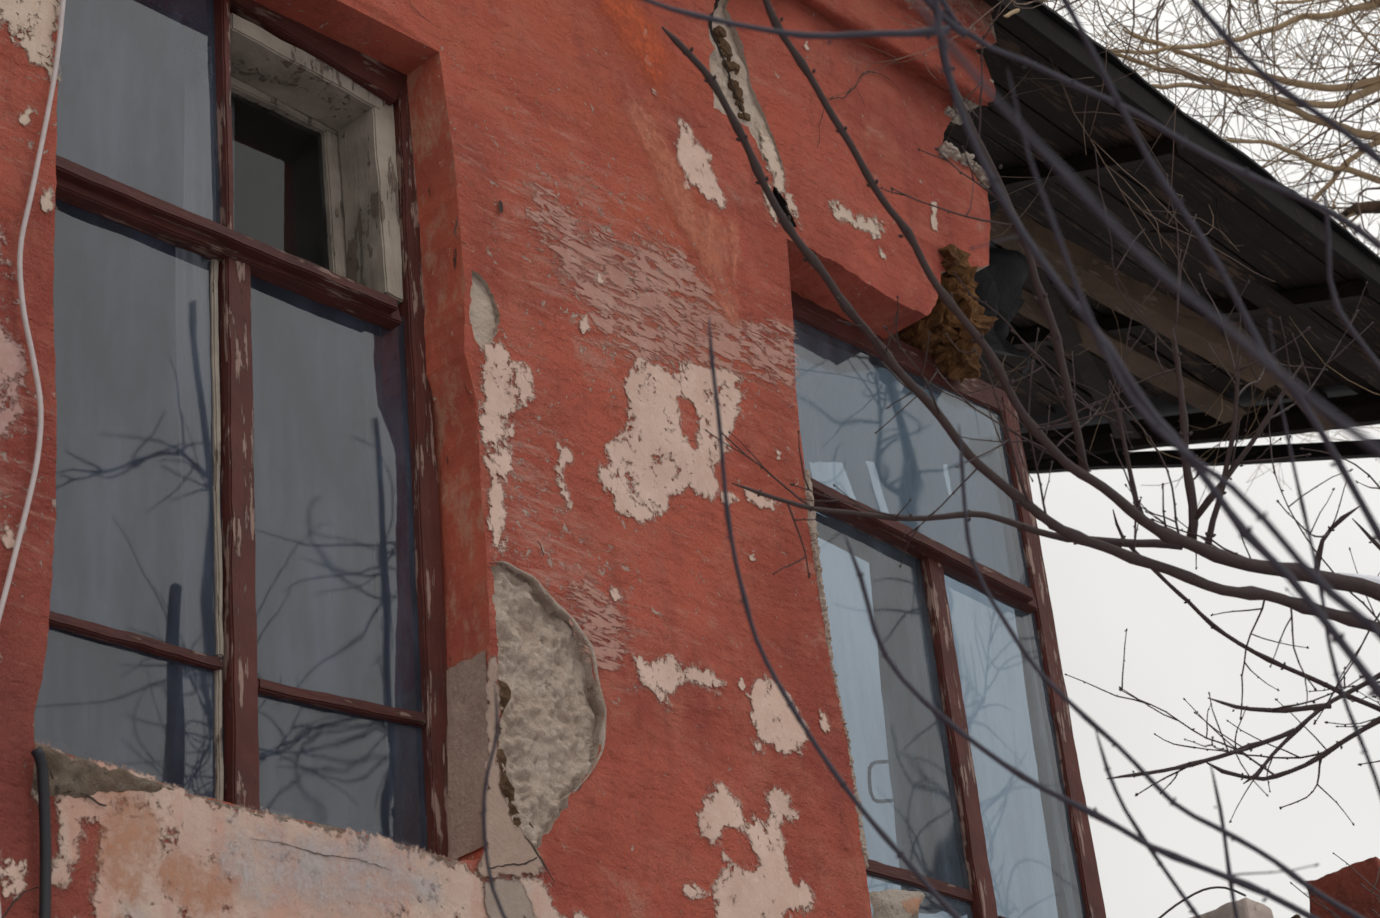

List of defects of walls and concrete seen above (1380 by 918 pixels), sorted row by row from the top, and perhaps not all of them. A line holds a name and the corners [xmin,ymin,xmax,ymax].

peeling [0,0,61,82]
peeling [18,105,34,126]
peeling [39,187,54,213]
peeling [673,117,726,209]
peeling [756,124,802,230]
peeling [0,224,29,437]
peeling [523,180,799,524]
peeling [0,523,16,549]
peeling [31,275,869,918]